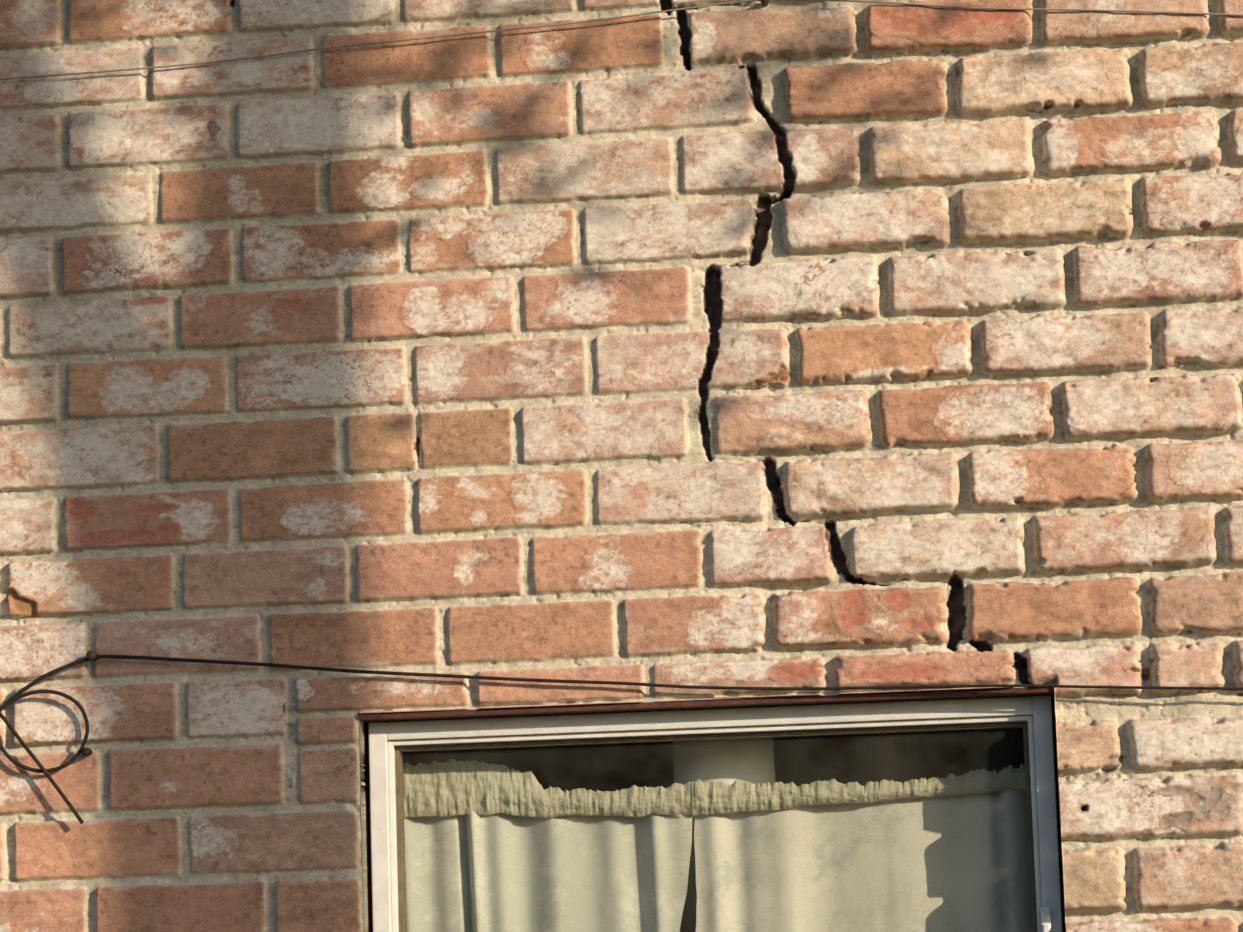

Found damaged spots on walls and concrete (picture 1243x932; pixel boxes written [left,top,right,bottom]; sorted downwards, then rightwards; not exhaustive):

crack [659,0,697,71]
crack [698,65,796,461]
crack [758,457,877,585]
crack [947,574,1030,684]